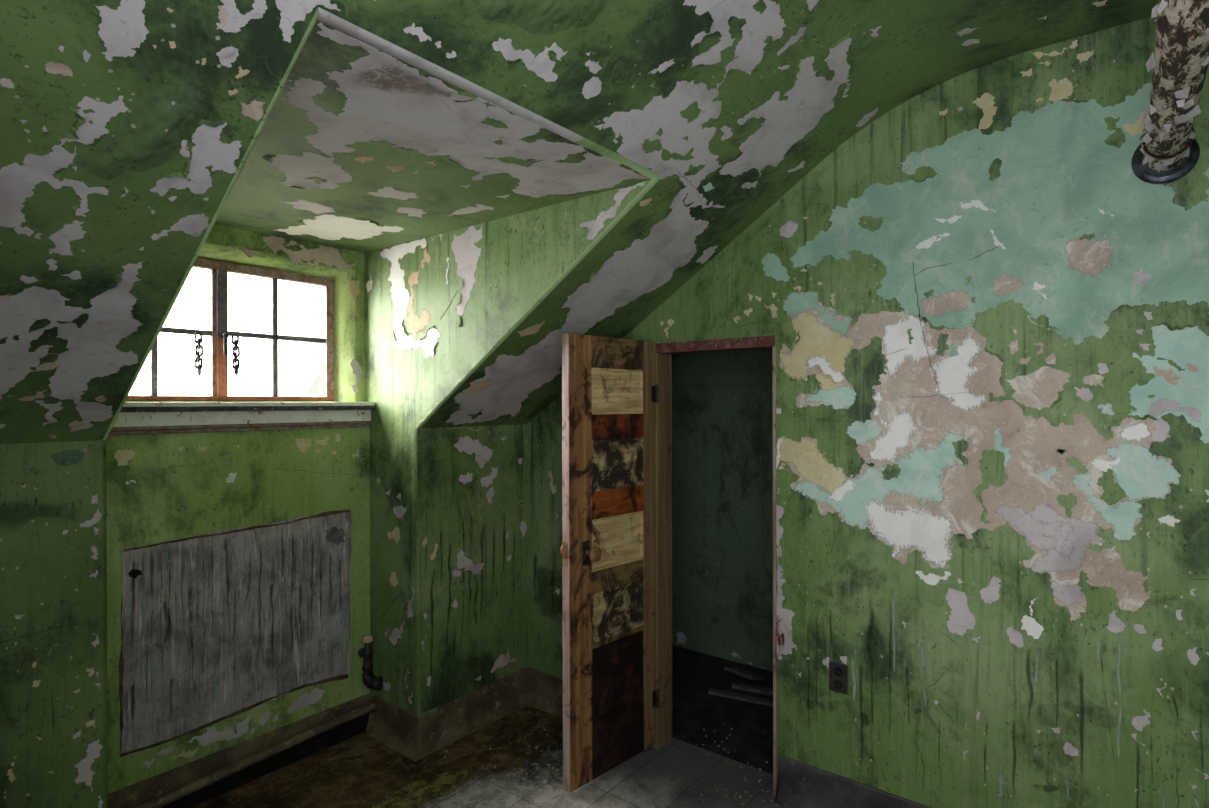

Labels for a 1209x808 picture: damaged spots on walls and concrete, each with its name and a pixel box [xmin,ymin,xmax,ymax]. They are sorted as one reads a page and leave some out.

peeling [44,45,73,77]
peeling [83,0,176,62]
peeling [957,27,980,46]
peeling [0,96,242,439]
peeling [201,0,852,504]
water stain [425,528,515,675]
peeling [799,656,847,677]
water stain [851,610,874,748]
water stain [889,600,909,702]
peeling [1036,728,1079,756]
water stain [1097,643,1121,757]
peeling [1131,713,1151,746]